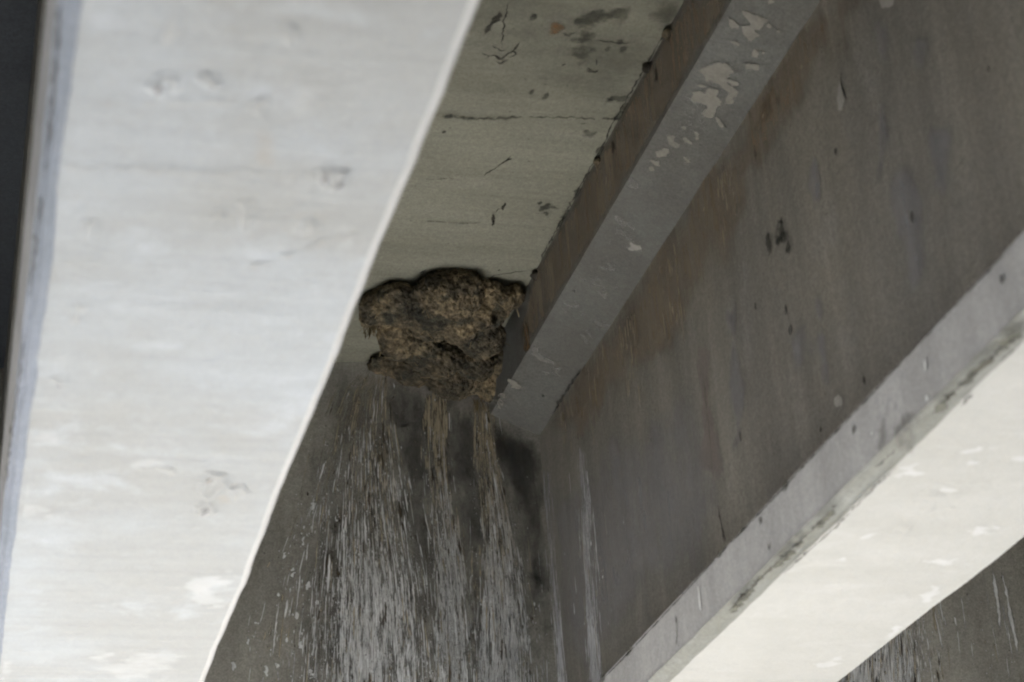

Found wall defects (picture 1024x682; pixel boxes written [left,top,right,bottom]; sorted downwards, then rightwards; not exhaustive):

peeling [691,10,780,128]
peeling [649,127,699,171]
water stain [248,375,565,682]